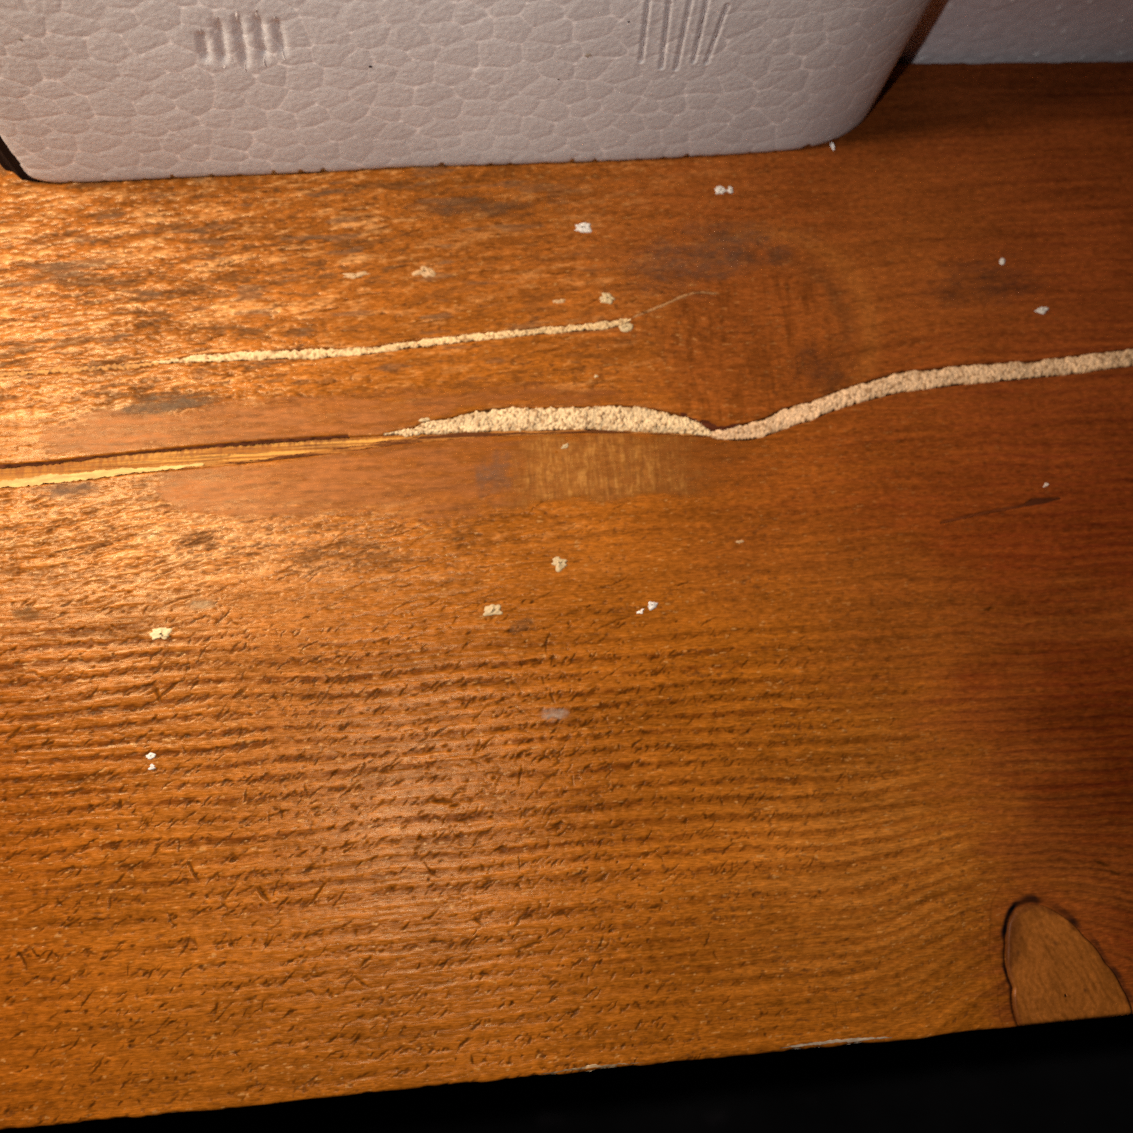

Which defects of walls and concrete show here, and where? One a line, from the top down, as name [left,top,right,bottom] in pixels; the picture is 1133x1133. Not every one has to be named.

crack [0,291,717,377]
crack [0,349,1133,488]
crack [941,497,1061,523]